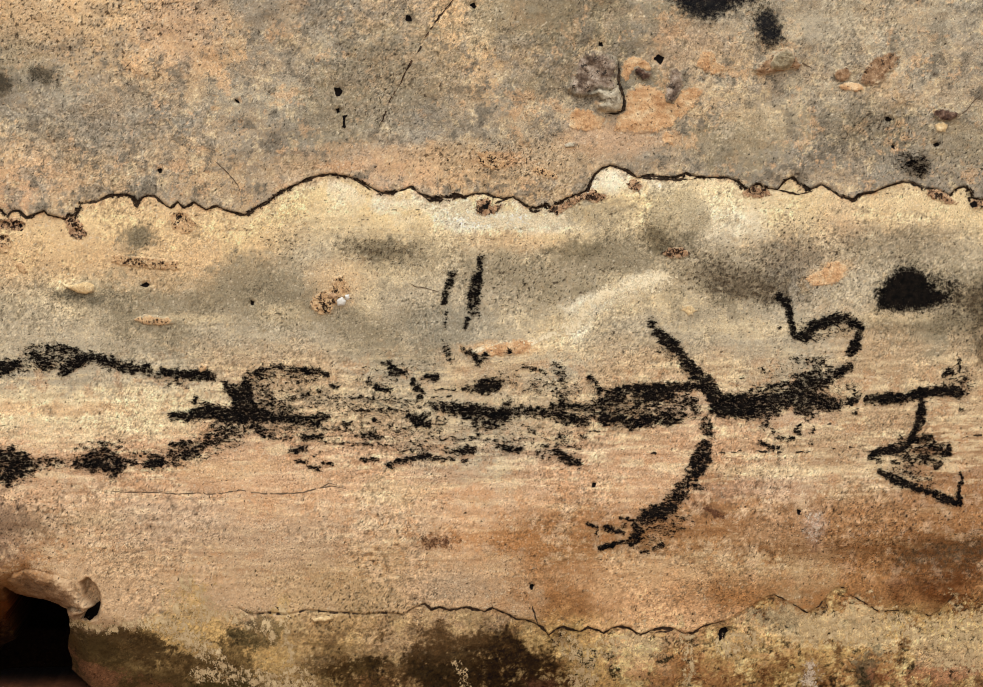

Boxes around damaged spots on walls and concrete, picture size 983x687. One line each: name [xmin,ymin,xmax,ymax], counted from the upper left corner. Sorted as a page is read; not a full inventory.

crack [0,162,983,225]
crack [241,606,388,618]
crack [412,603,722,646]
crack [772,587,902,623]
water stain [798,659,825,687]